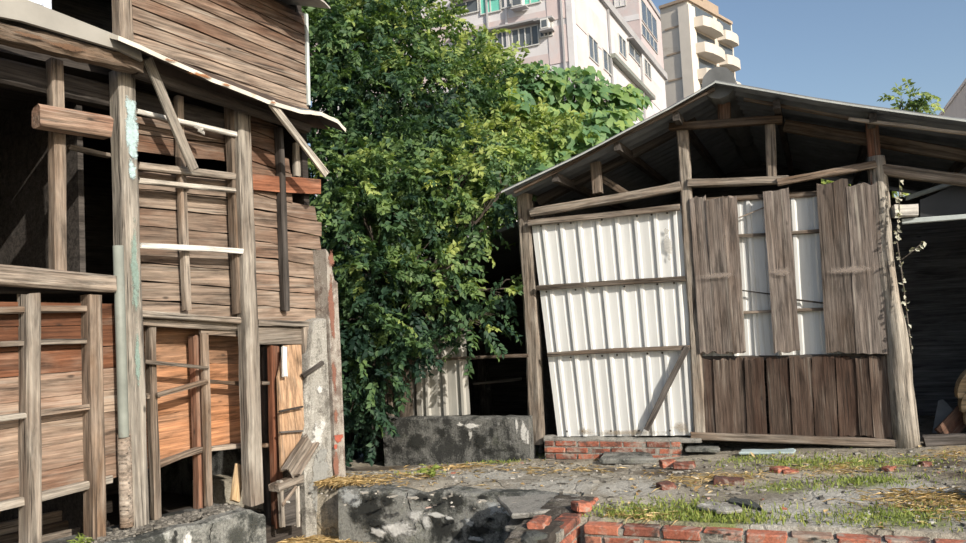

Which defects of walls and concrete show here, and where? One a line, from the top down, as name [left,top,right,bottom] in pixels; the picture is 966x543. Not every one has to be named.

peeling [125,98,139,178]
peeling [311,410,338,446]
flaking render [333,434,343,476]
damp [392,433,427,454]
damp [457,422,494,454]
damp [515,419,529,444]
damp [350,494,393,529]
damp [443,494,487,512]
damp [171,530,192,543]
damp [228,516,257,543]
damp [431,517,493,540]